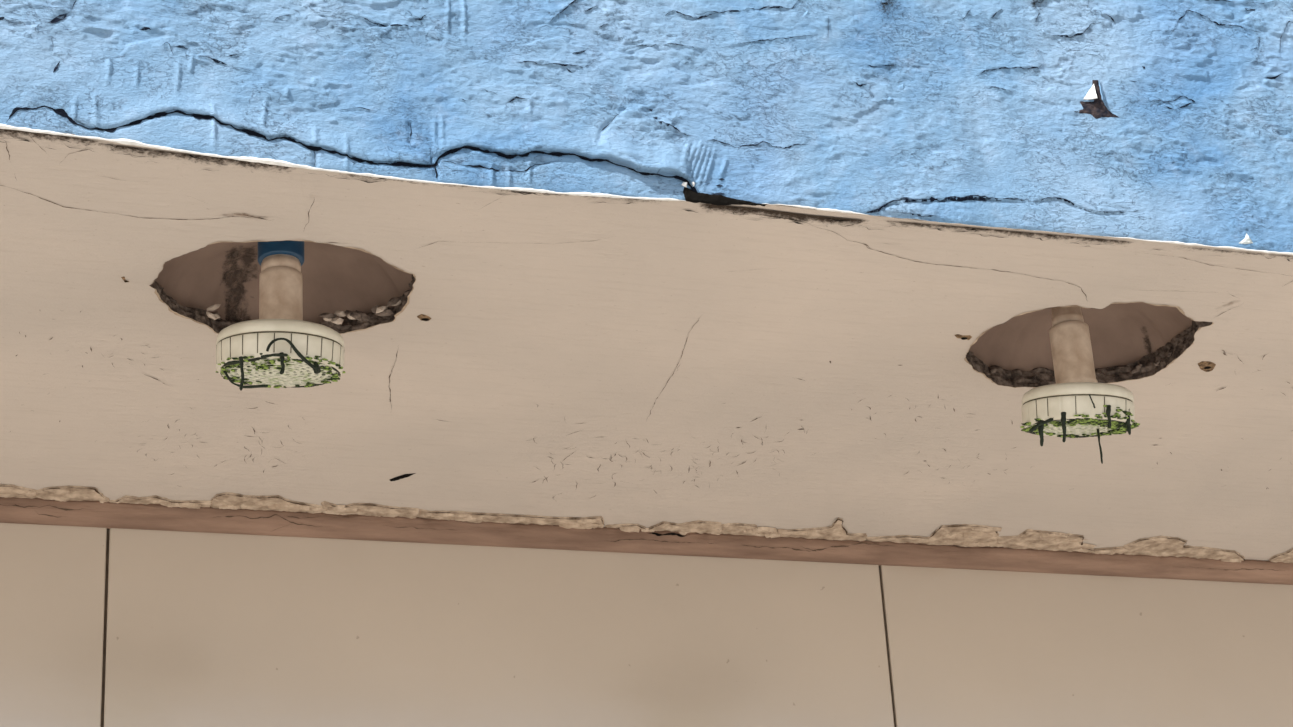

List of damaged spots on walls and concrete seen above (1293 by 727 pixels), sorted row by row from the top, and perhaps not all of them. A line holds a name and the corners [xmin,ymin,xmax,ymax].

crack [48,1,76,73]
crack [139,27,254,73]
crack [362,15,439,40]
crack [518,0,829,73]
crack [982,1,1116,93]
peeling [1074,80,1118,119]
crack [1133,81,1195,110]
crack [0,105,1125,300]
spalling [149,240,431,334]
spalling [955,302,1216,388]
flaking render [0,484,1245,563]
flaking render [1269,548,1293,564]